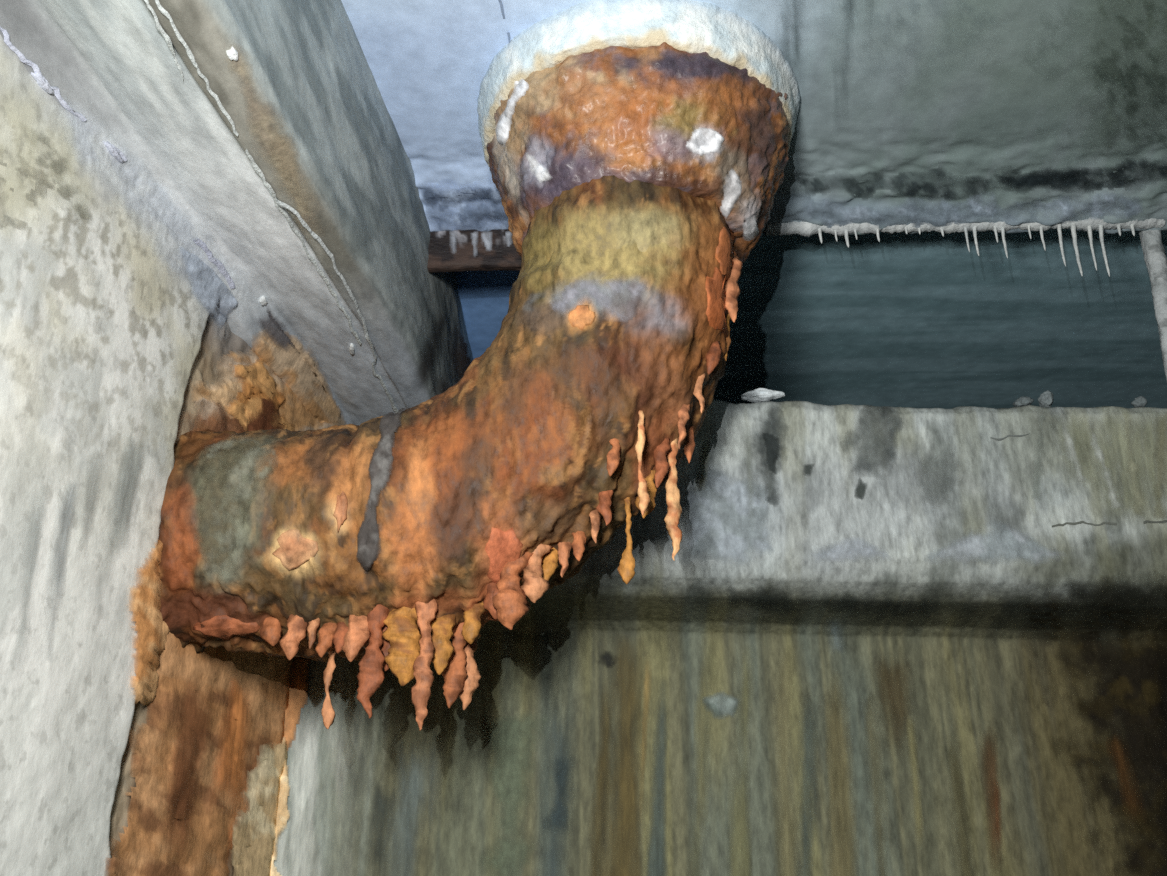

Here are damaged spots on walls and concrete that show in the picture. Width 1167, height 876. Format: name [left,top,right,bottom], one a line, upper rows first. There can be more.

crack [498,0,510,43]
mould [58,185,90,219]
water stain [117,449,140,531]
water stain [56,487,73,590]
corrosion [107,227,743,876]